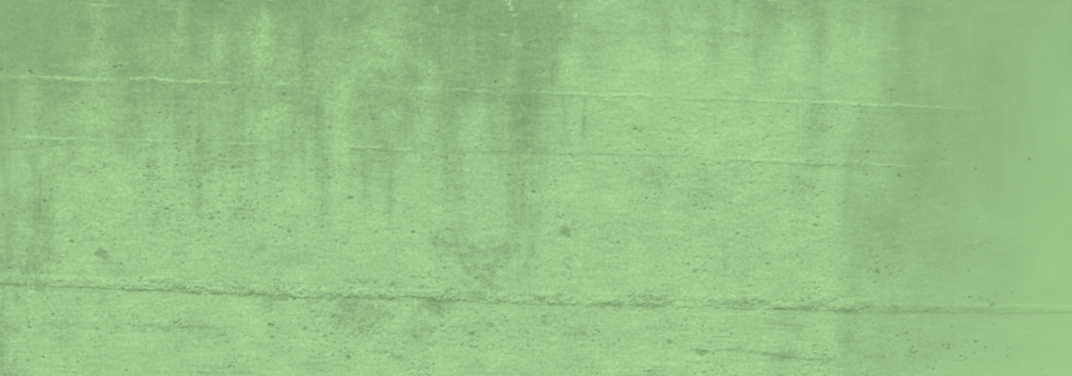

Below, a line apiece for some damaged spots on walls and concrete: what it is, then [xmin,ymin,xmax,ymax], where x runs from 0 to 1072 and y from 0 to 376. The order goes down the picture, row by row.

leakage [90,274,355,317]
leakage [295,271,403,346]
leakage [600,236,784,314]